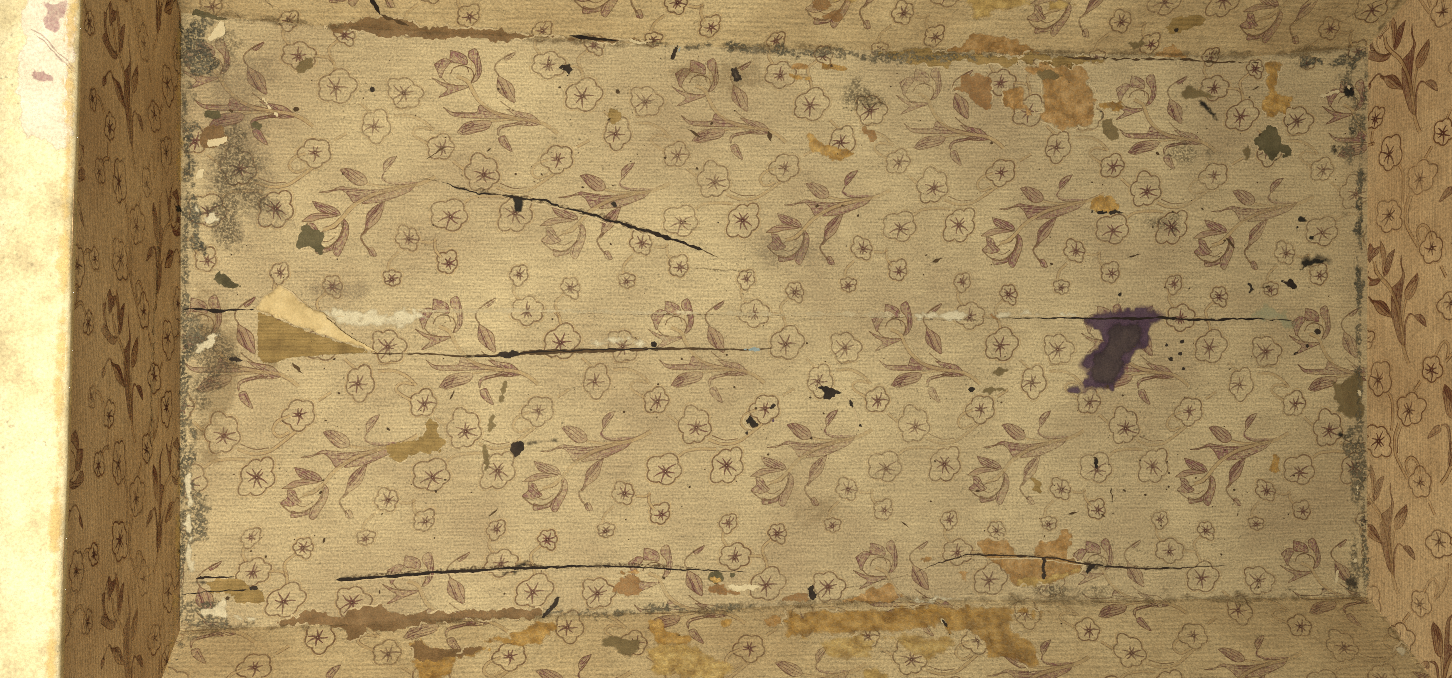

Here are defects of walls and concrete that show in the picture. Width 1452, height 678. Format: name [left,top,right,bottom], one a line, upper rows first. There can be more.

water stain [184,17,220,99]
water stain [1037,69,1063,80]
water stain [186,122,207,256]
crack [427,179,736,271]
peeling [256,285,378,353]
crack [372,347,772,358]
crack [336,561,743,582]
crack [846,552,1225,588]
water stain [549,603,687,618]
water stain [603,636,639,656]